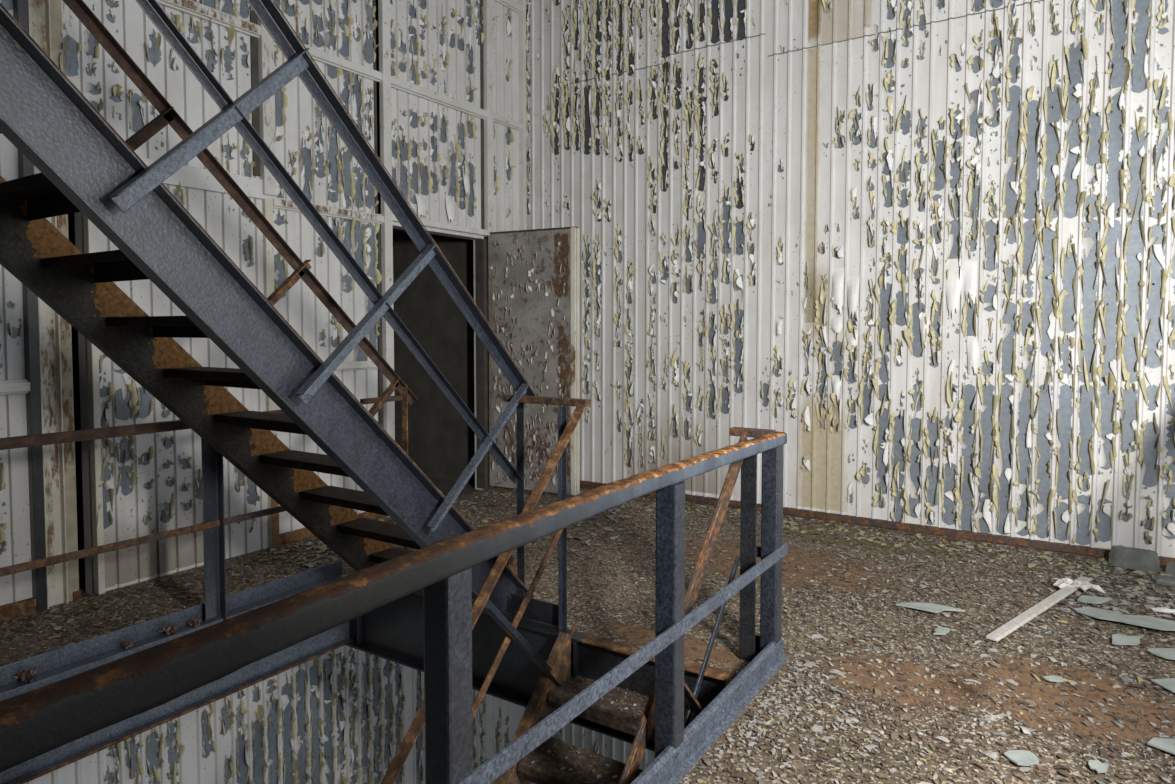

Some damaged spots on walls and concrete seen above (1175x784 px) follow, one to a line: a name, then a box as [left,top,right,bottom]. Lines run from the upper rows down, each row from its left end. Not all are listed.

peeling [273,0,512,217]
corrosion [19,200,82,258]
peeling [96,349,202,533]
corrosion [89,263,248,415]
corrosion [248,427,288,456]
corrosion [271,498,314,548]
corrosion [290,468,327,493]
peeling [273,102,382,361]
corrosion [489,324,576,481]
peeling [490,0,772,487]
peeling [761,0,1175,545]
peeling [201,647,425,784]